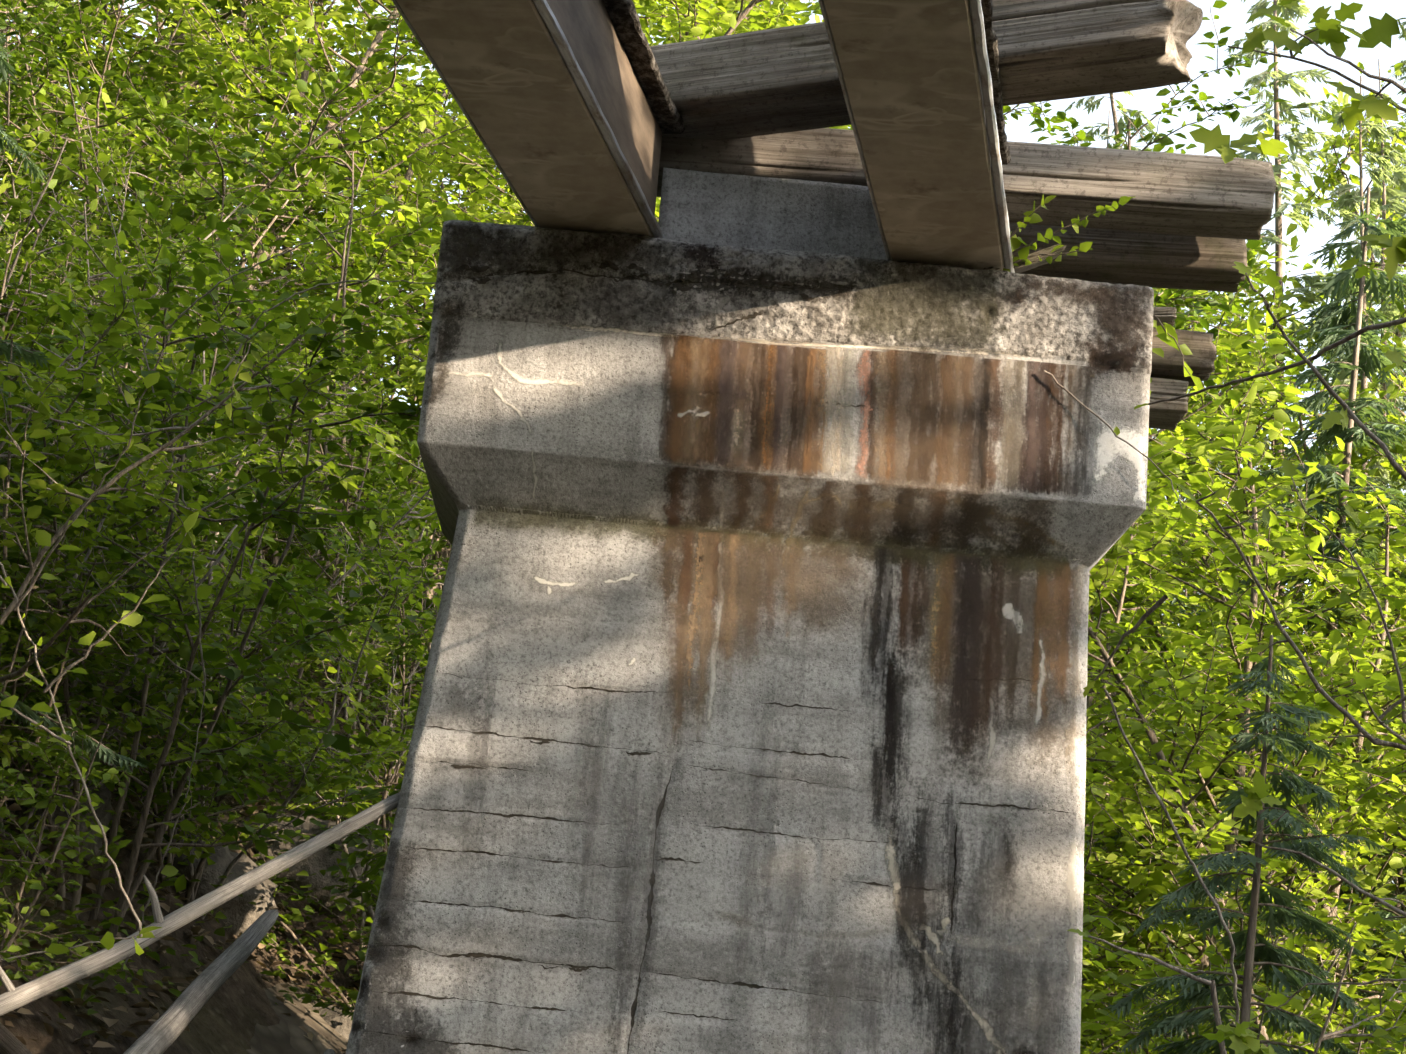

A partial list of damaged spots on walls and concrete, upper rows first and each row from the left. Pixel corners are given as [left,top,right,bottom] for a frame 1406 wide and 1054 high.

water stain [707,592,724,726]
rust [654,334,1077,785]
water stain [871,549,903,774]
water stain [988,696,996,759]
water stain [1002,603,1023,633]
water stain [1035,640,1046,724]
crack [363,725,1074,1054]
water stain [1066,844,1077,984]